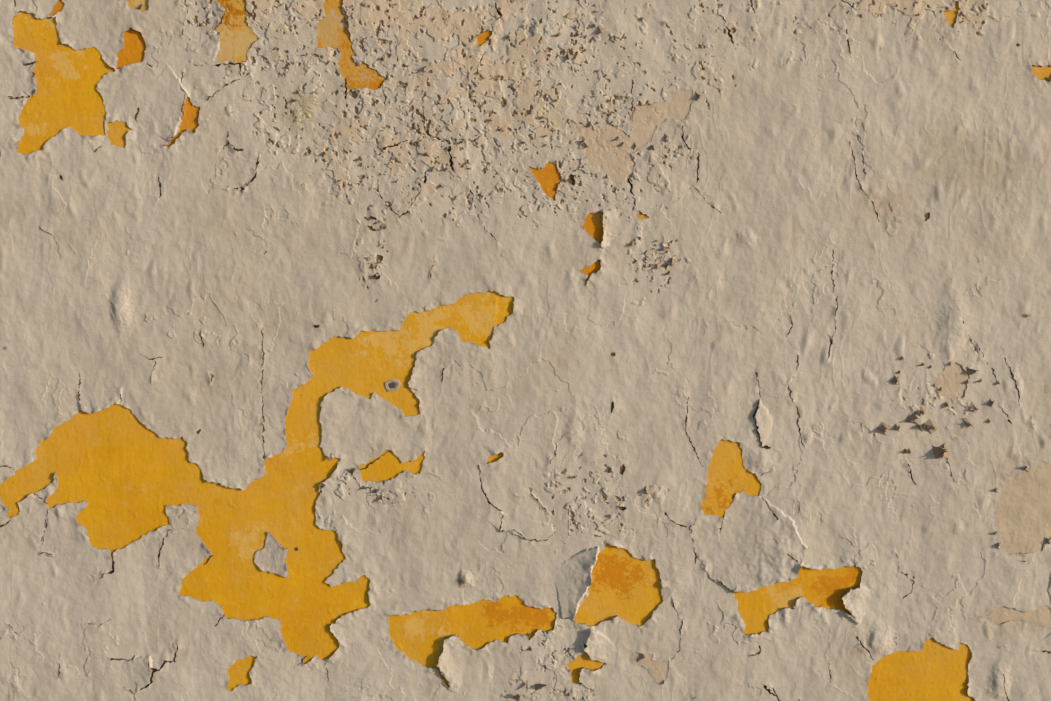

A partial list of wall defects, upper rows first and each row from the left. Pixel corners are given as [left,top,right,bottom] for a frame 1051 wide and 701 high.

peeling [839,0,991,41]
peeling [12,0,149,155]
peeling [144,66,200,147]
peeling [174,0,701,286]
crack [849,134,880,222]
peeling [0,290,515,664]
crack [478,465,556,542]
peeling [389,457,663,697]
peeling [692,439,874,636]
peeling [994,461,1051,555]
spalling [119,643,178,694]
peeling [867,638,975,701]